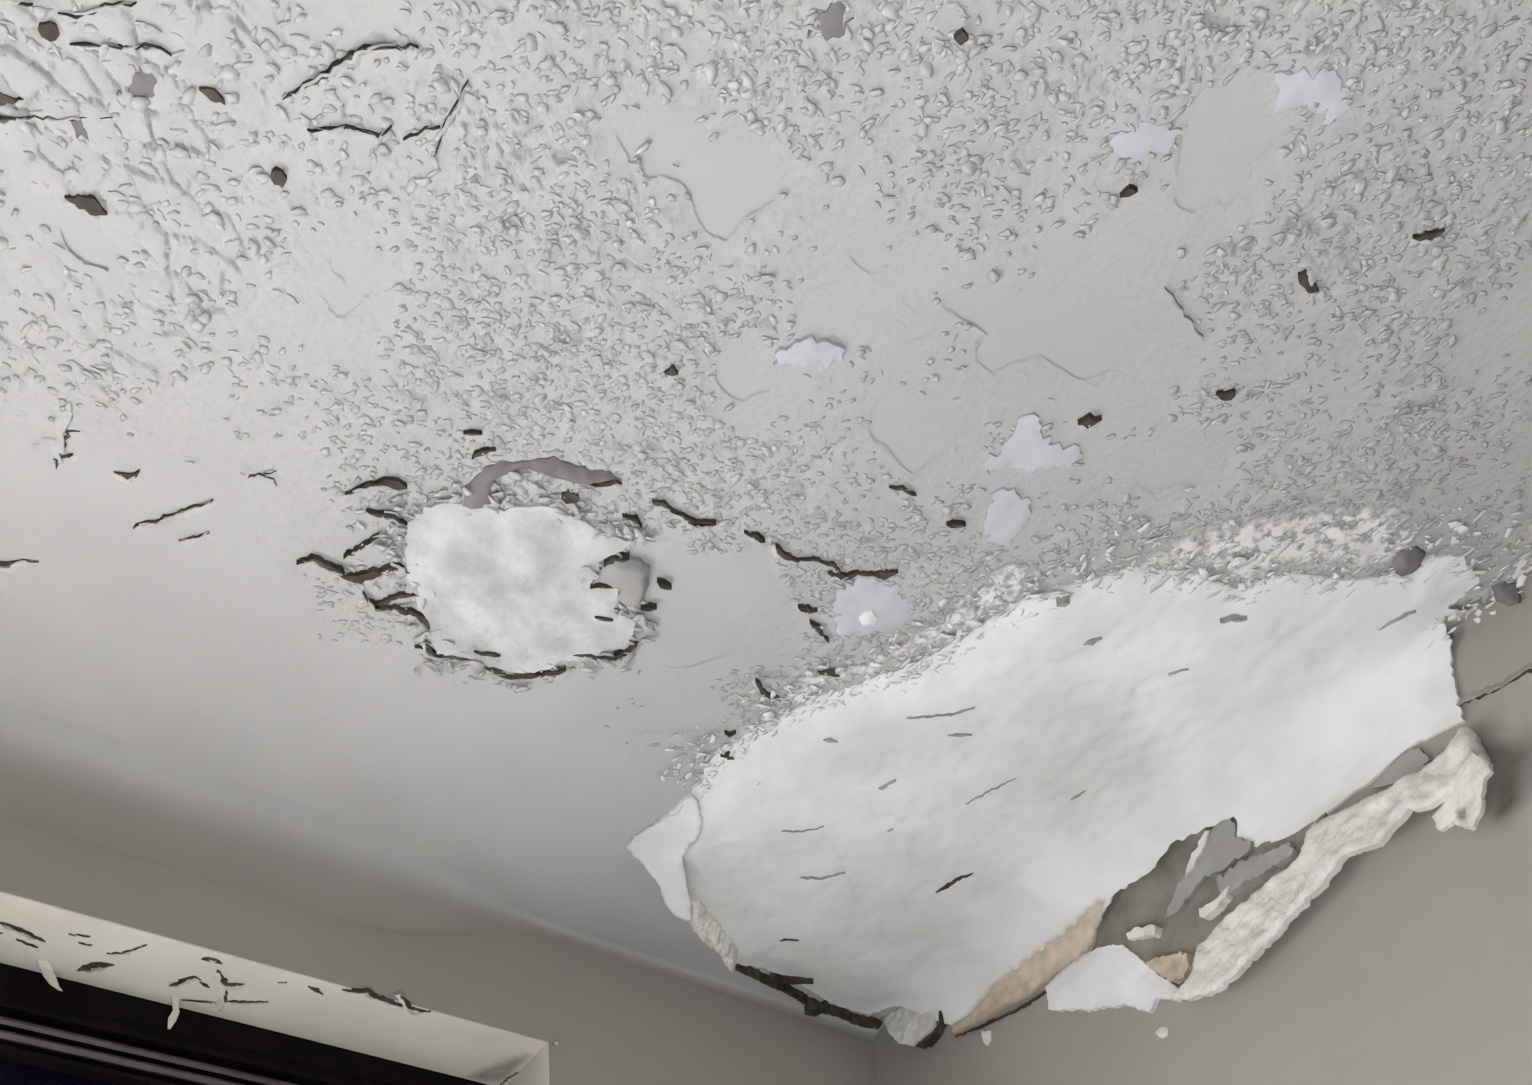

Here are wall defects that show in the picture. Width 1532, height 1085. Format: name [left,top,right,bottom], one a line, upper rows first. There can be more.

crack [282,42,468,158]
crack [51,410,80,469]
crack [114,468,145,484]
crack [248,469,277,486]
crack [132,498,218,546]
crack [0,559,40,574]
flaking render [655,576,672,590]
peeling [300,562,487,688]
flaking render [1081,725,1494,1003]
peeling [36,958,62,991]
peeling [167,996,179,1029]
flaking render [883,1007,947,1050]